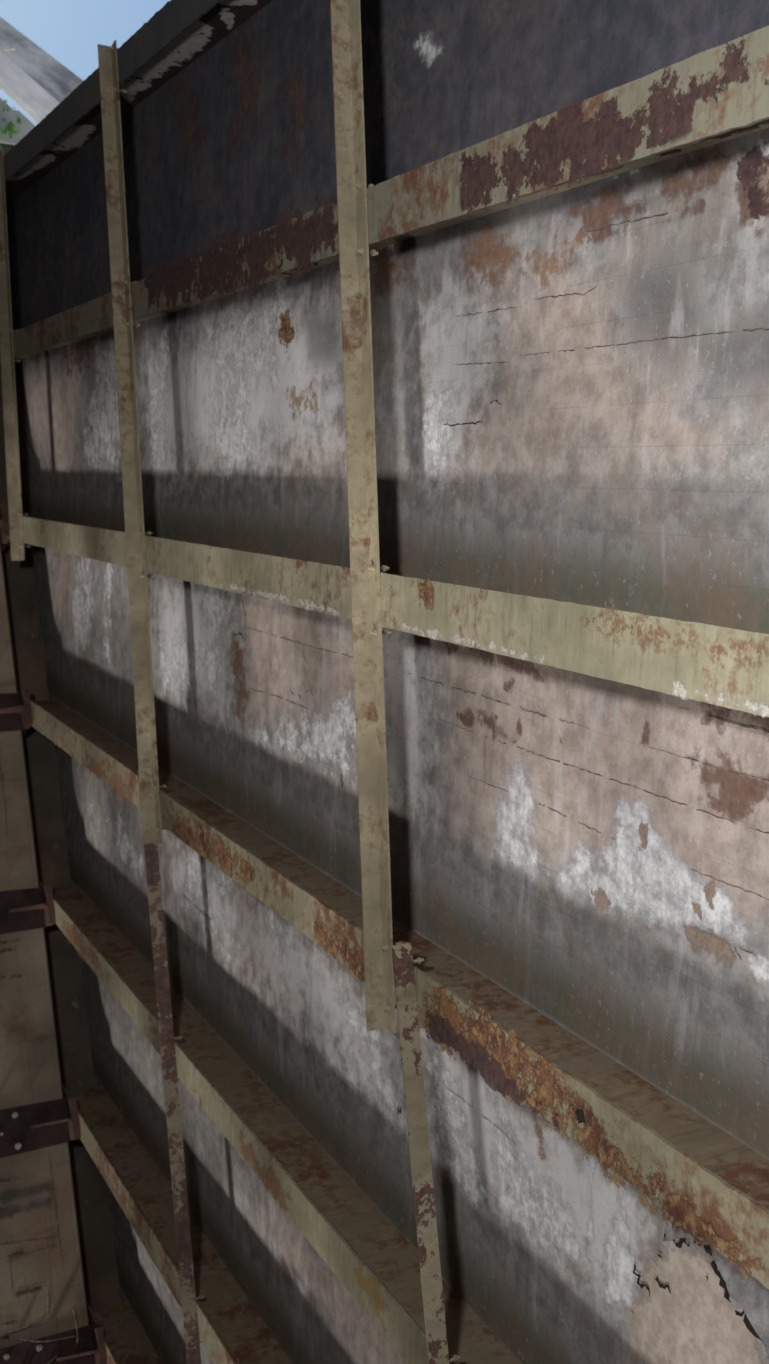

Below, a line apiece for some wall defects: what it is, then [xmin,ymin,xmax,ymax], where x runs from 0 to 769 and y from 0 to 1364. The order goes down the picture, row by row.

peeling [119,0,257,102]
peeling [8,124,96,181]
rust [460,35,769,286]
rust [140,194,339,310]
crack [455,286,597,317]
crack [454,328,769,365]
damp [493,763,539,873]
crack [440,719,769,834]
rust [693,754,768,821]
damp [557,798,769,982]
rust [422,987,766,1282]
spalling [623,1216,769,1364]